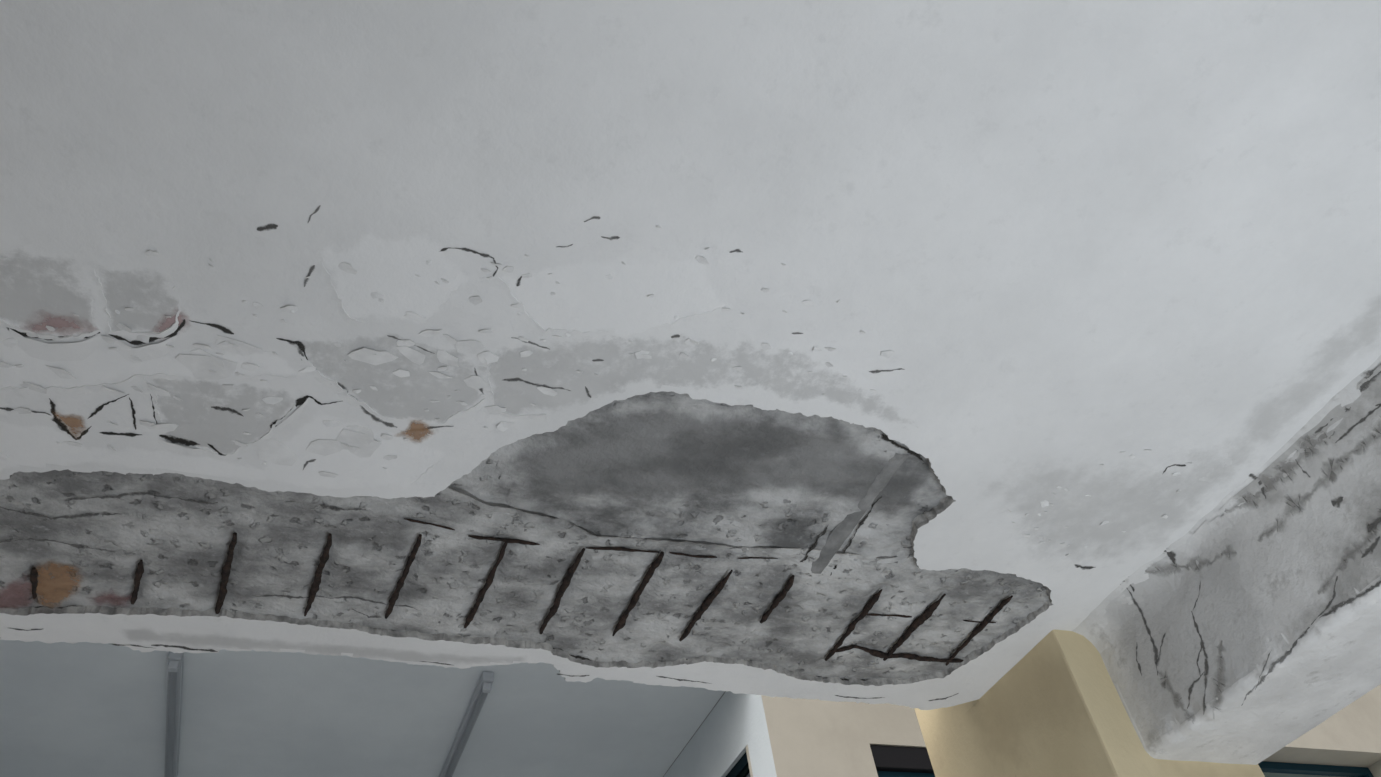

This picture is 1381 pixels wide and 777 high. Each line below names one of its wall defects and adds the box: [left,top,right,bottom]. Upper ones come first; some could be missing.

spalling [0,218,1053,699]
crack [1249,474,1266,498]
crack [1315,368,1381,443]
corrosion [36,562,80,608]
crack [1124,550,1209,712]
crack [1241,576,1381,706]